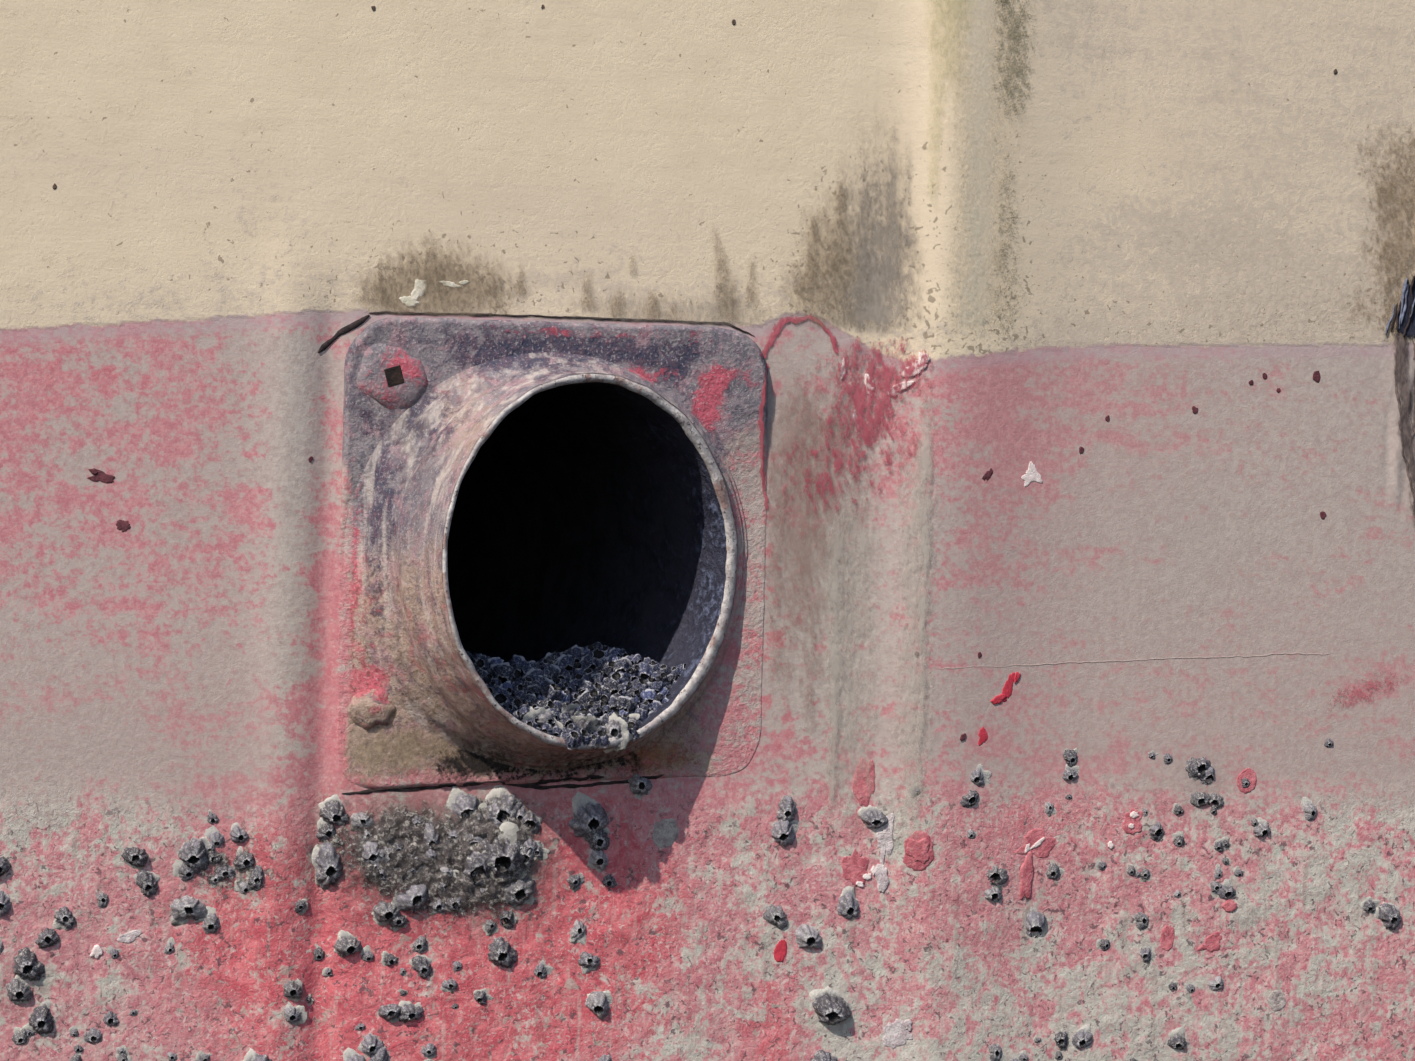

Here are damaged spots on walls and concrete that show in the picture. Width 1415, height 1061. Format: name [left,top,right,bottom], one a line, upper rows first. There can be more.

mould [994,0,1033,119]
leakage [796,173,908,327]
leakage [362,253,523,313]
peeling [758,314,933,514]
peeling [960,727,988,746]
peeling [852,758,875,807]
peeling [841,813,934,893]
peeling [1014,828,1056,900]
peeling [1108,808,1143,850]
peeling [774,940,787,962]
peeling [1160,925,1175,951]
peeling [1197,932,1222,952]